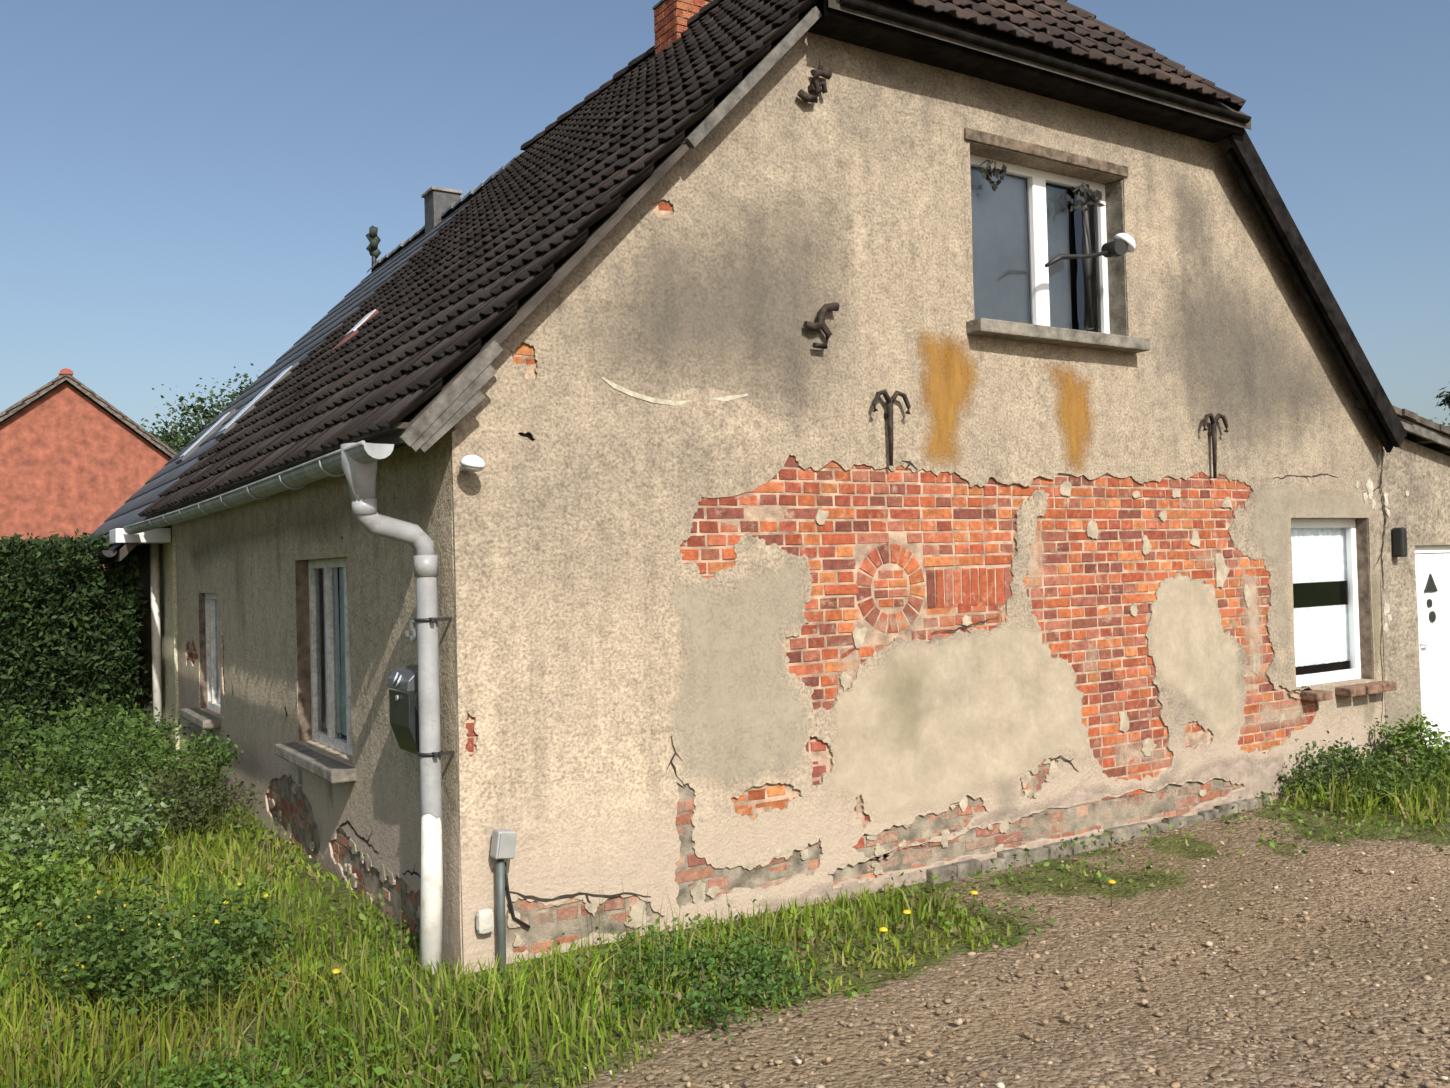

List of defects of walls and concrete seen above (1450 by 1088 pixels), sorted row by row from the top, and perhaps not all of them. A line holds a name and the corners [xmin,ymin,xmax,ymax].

spalling [511,342,536,379]
rust [923,340,974,459]
rust [1057,374,1089,464]
spalling [187,641,198,665]
spalling [675,455,1318,911]
spalling [465,713,478,757]
spalling [267,775,420,938]
crack [339,820,421,878]
spalling [505,895,663,955]